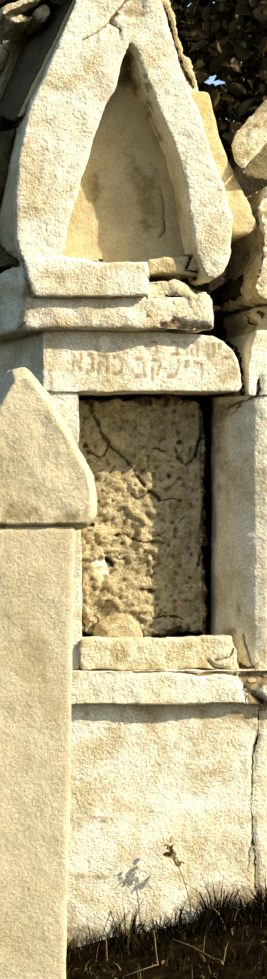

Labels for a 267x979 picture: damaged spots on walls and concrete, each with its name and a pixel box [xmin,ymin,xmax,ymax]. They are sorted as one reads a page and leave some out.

crack [83,0,127,40]
crack [163,5,194,88]
crack [88,402,182,502]
crack [151,447,197,466]
crack [115,533,163,560]
crack [134,634,264,898]